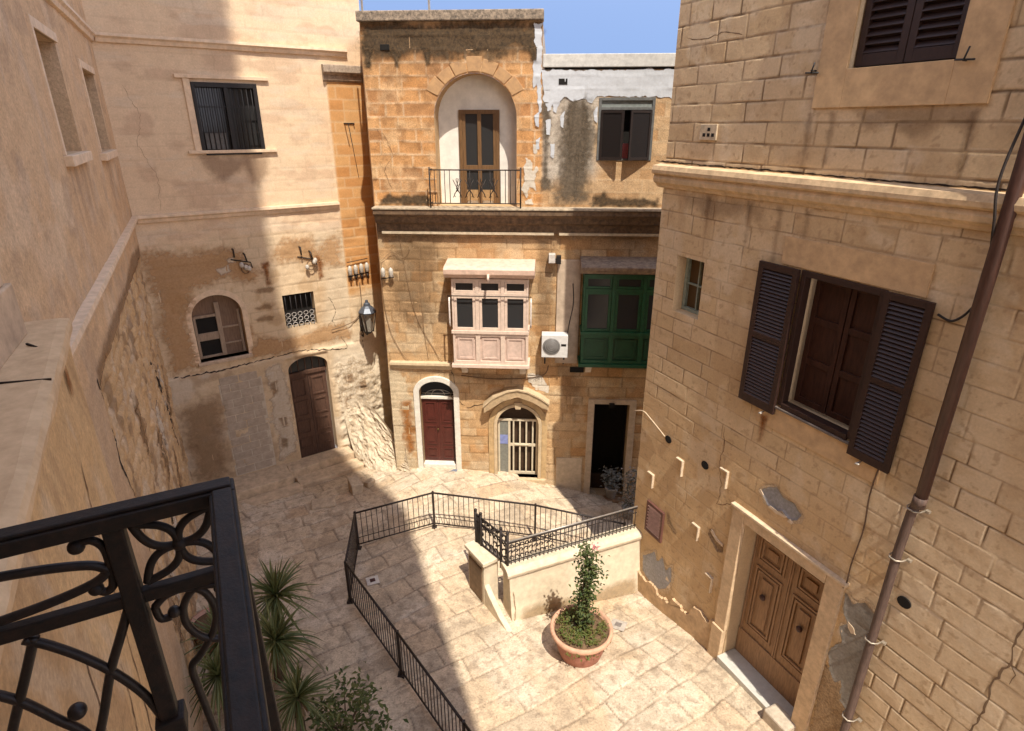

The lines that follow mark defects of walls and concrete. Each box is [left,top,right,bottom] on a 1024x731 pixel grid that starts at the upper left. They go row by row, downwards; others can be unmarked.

leakage [361,20,542,68]
peeling [533,23,674,158]
leakage [541,90,658,207]
flaking render [640,549,675,594]
flaking render [708,529,723,553]
flaking render [758,484,804,525]
flaking render [809,589,875,731]
crack [969,622,1024,731]